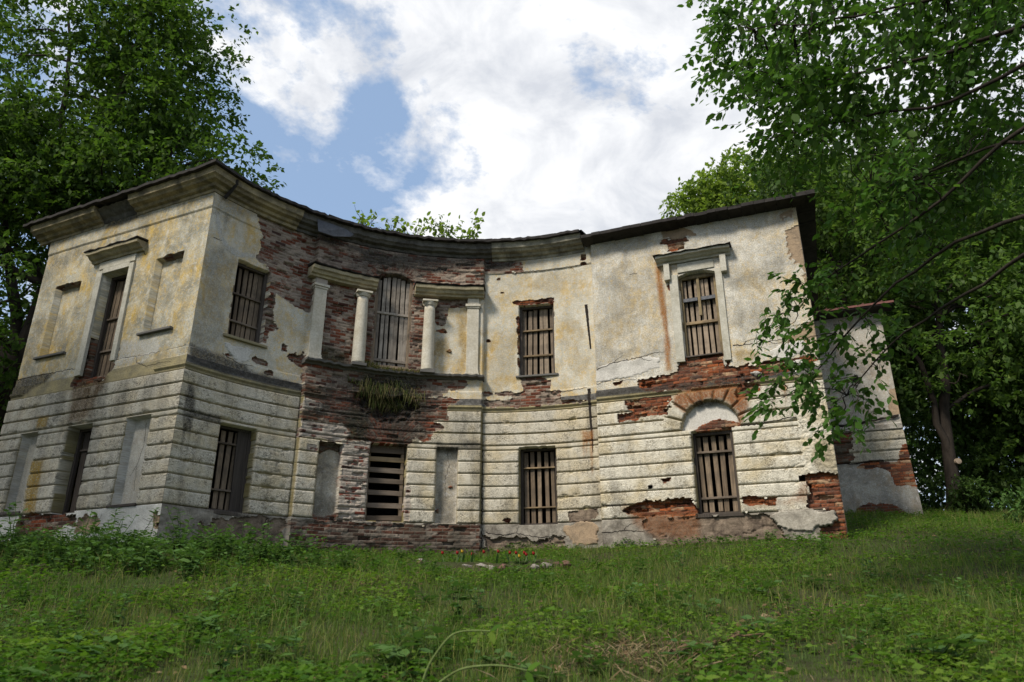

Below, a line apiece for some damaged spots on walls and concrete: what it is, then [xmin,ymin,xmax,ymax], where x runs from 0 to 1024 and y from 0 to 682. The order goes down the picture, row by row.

peeling [660,228,696,252]
peeling [779,210,807,282]
spalling [224,215,587,409]
rust [656,267,670,368]
crack [561,304,664,452]
spalling [617,320,817,423]
spalling [296,398,372,522]
spalling [402,483,411,522]
peeling [622,477,787,545]
spalling [798,431,917,539]